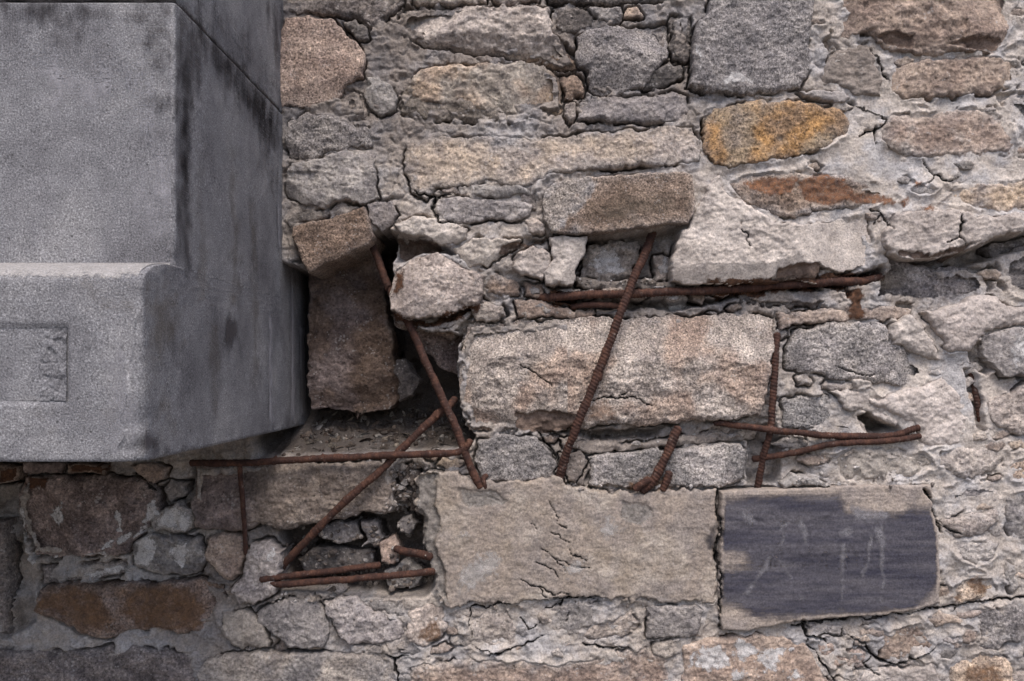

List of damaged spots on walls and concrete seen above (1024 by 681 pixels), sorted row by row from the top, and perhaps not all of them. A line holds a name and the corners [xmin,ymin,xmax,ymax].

leakage [157,3,279,261]
spalling [370,244,392,296]
rust [393,269,404,293]
spalling [398,238,444,261]
rust [392,303,480,329]
rust [550,289,578,311]
rust [707,269,878,319]
leakage [290,272,306,416]
spalling [189,320,506,601]
crack [468,501,594,655]
crack [791,595,1024,679]